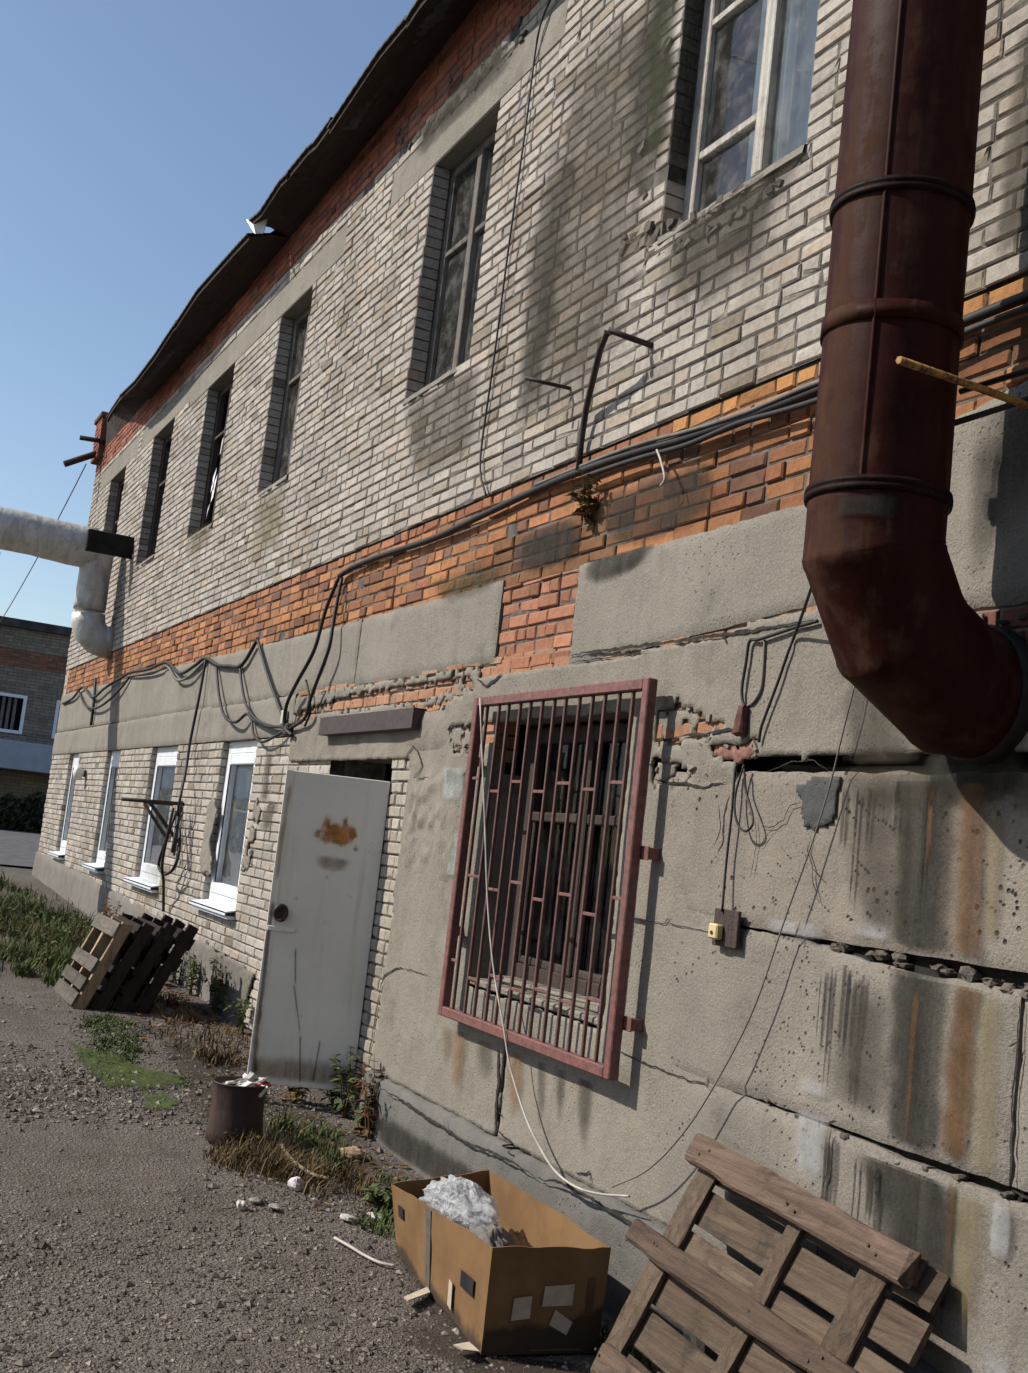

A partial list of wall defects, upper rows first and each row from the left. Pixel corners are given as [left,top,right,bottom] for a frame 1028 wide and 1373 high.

damp [521,0,705,392]
spalling [616,183,748,279]
spalling [649,707,760,786]
corrosion [315,818,357,863]
damp [840,775,949,947]
corrosion [955,784,981,952]
damp [816,967,871,1095]
damp [889,969,940,1146]
corrosion [942,986,978,1157]
crack [1008,999,1028,1199]
damp [851,1156,947,1272]
damp [910,1302,930,1319]